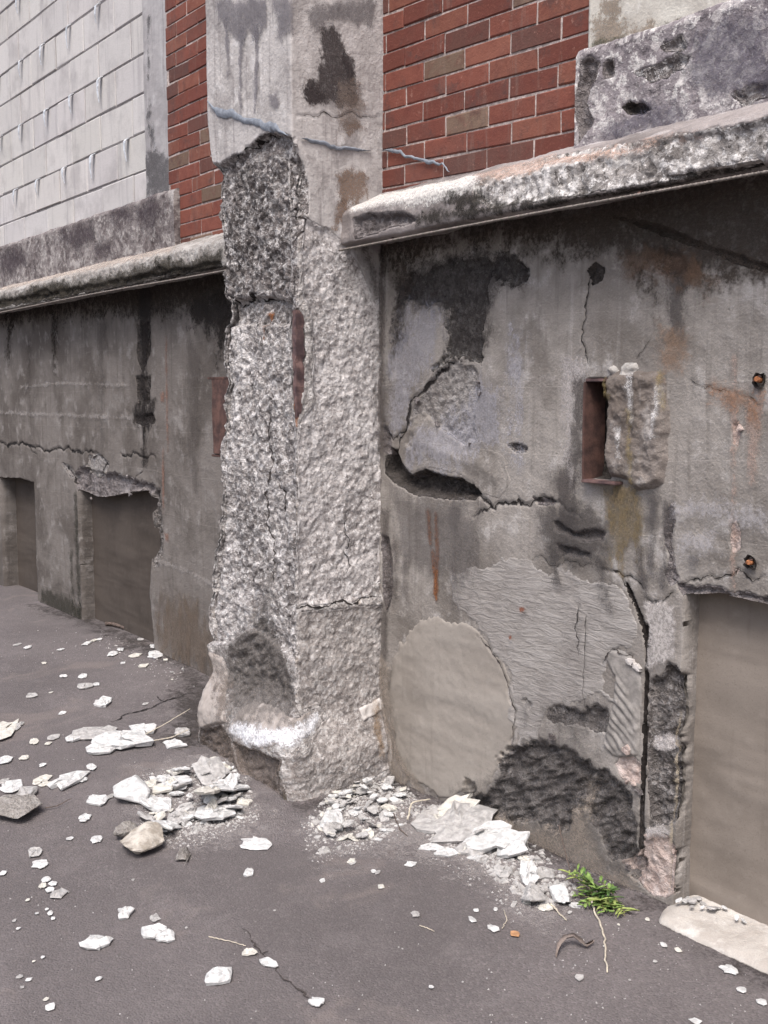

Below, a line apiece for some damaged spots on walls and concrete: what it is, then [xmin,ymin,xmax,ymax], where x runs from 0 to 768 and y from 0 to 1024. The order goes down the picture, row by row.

water stain [215,0,294,113]
crack [207,101,449,244]
water stain [342,52,358,107]
water stain [0,254,229,467]
spalling [404,251,530,445]
water stain [351,173,768,492]
crack [581,269,597,364]
crack [0,441,156,485]
peeling [0,132,482,801]
rust [426,510,439,601]
spalling [462,662,686,898]
crack [532,555,760,849]